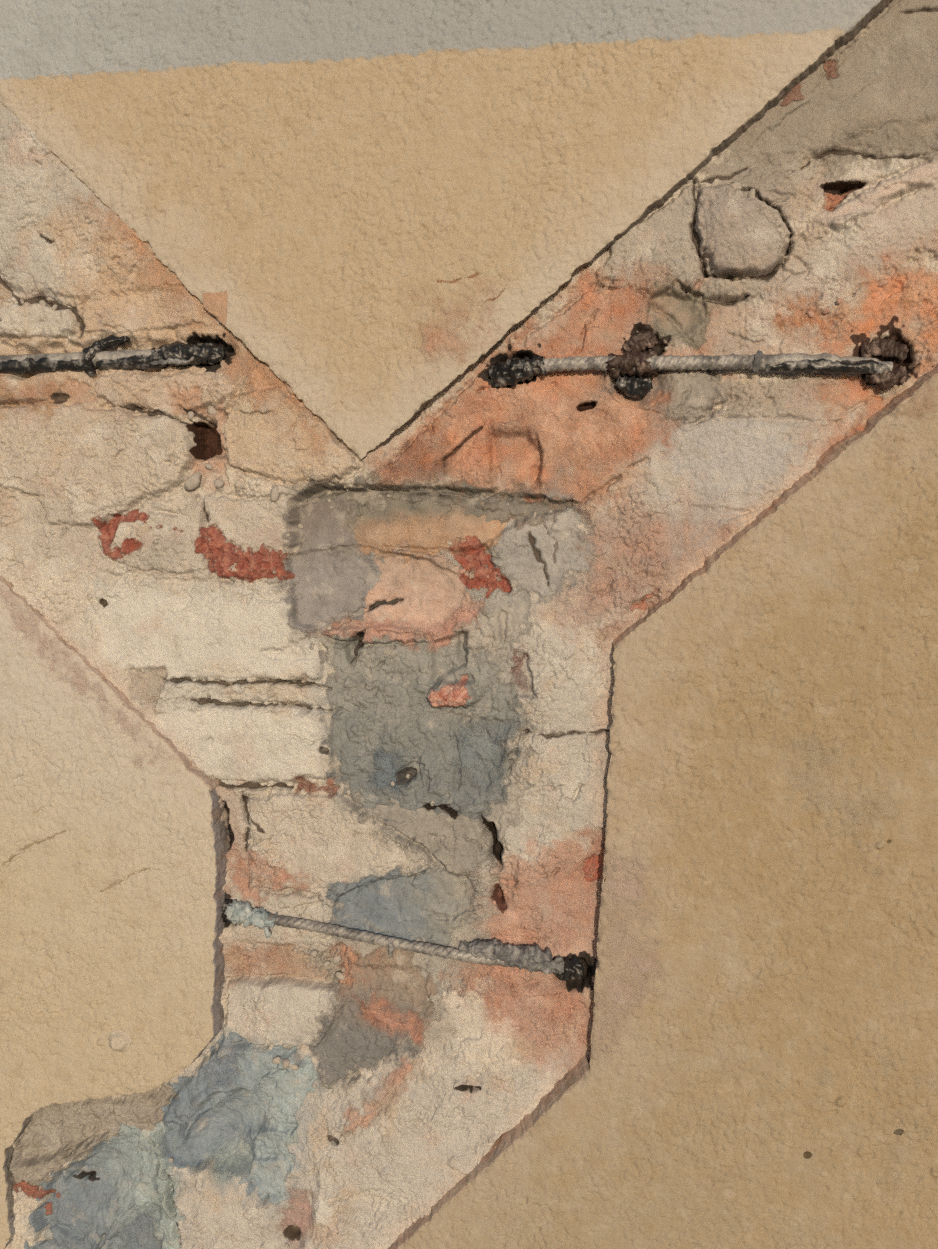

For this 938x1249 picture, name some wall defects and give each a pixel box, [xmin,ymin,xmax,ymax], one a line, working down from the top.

crack [792,149,938,187]
crack [690,168,792,305]
crack [0,276,85,338]
spalling [92,509,182,560]
spalling [195,524,295,583]
spalling [450,536,512,597]
crack [351,598,403,663]
crack [164,678,333,711]
spalling [428,674,472,707]
crack [423,803,503,865]
spalling [582,850,605,881]
spalling [13,1181,61,1215]